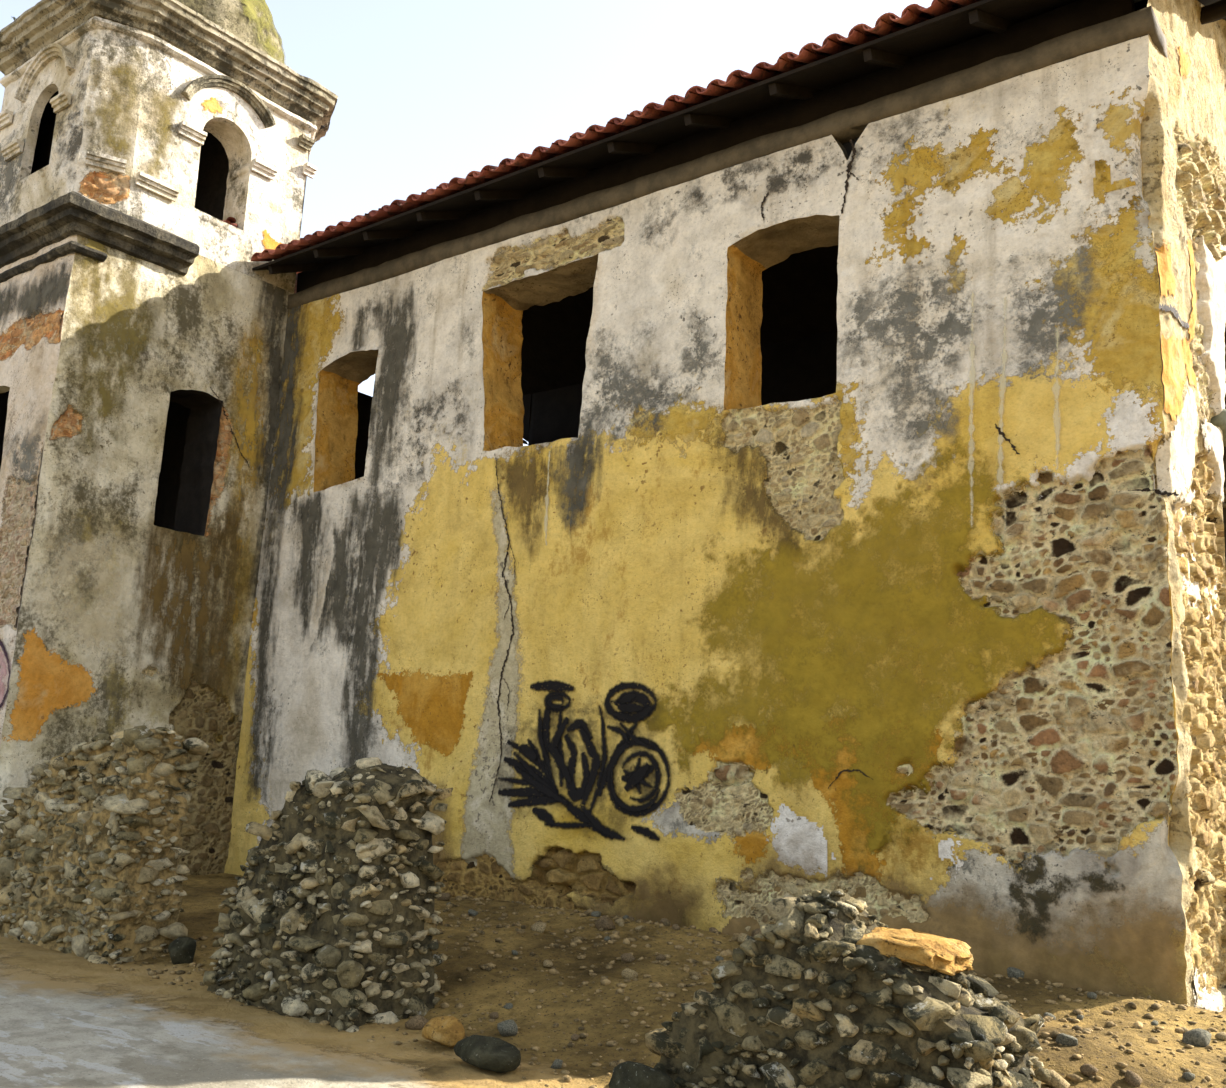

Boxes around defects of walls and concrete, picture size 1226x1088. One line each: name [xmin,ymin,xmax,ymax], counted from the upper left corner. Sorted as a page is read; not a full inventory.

crack [761,192,769,220]
crack [841,139,859,214]
damp [0,258,157,452]
mould [1009,246,1093,372]
damp [7,433,42,507]
peeling [0,404,98,743]
damp [137,281,469,799]
crack [489,454,516,802]
peeling [163,35,1226,1012]
damp [643,264,1074,852]
damp [721,857,811,936]
damp [837,866,1187,1004]